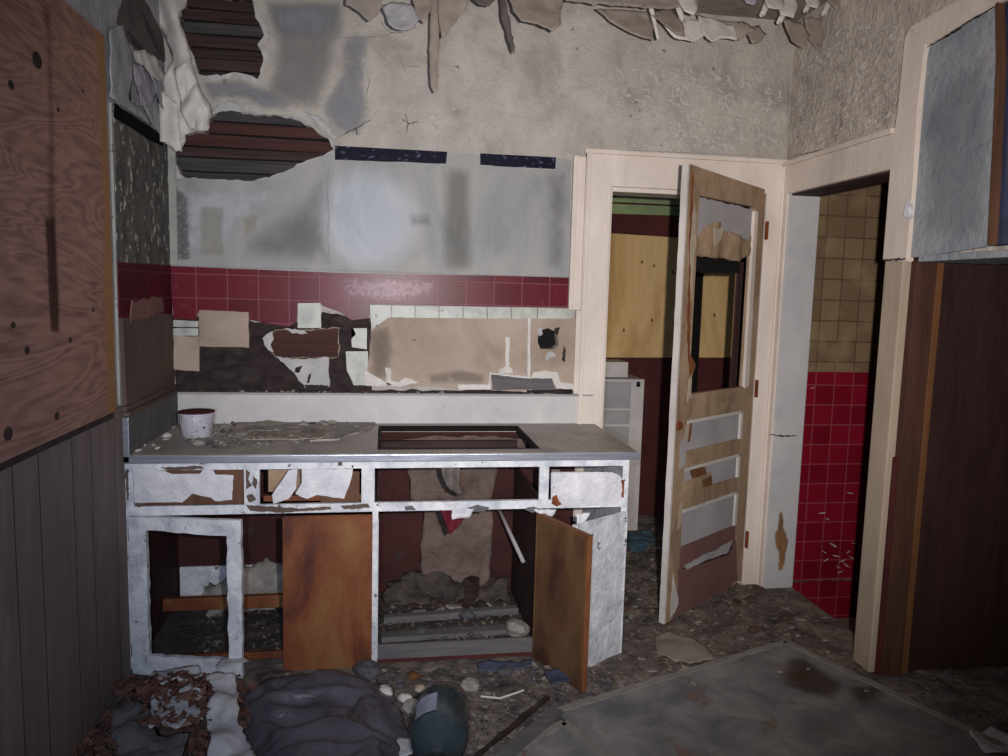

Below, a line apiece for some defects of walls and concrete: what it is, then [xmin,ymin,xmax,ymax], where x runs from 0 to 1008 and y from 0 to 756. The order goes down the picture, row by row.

peeling [109,0,165,133]
flaking render [178,0,269,82]
peeling [346,0,840,93]
flaking render [176,100,338,182]
peeling [130,296,573,394]
rust [775,513,788,570]
water stain [790,661,836,695]